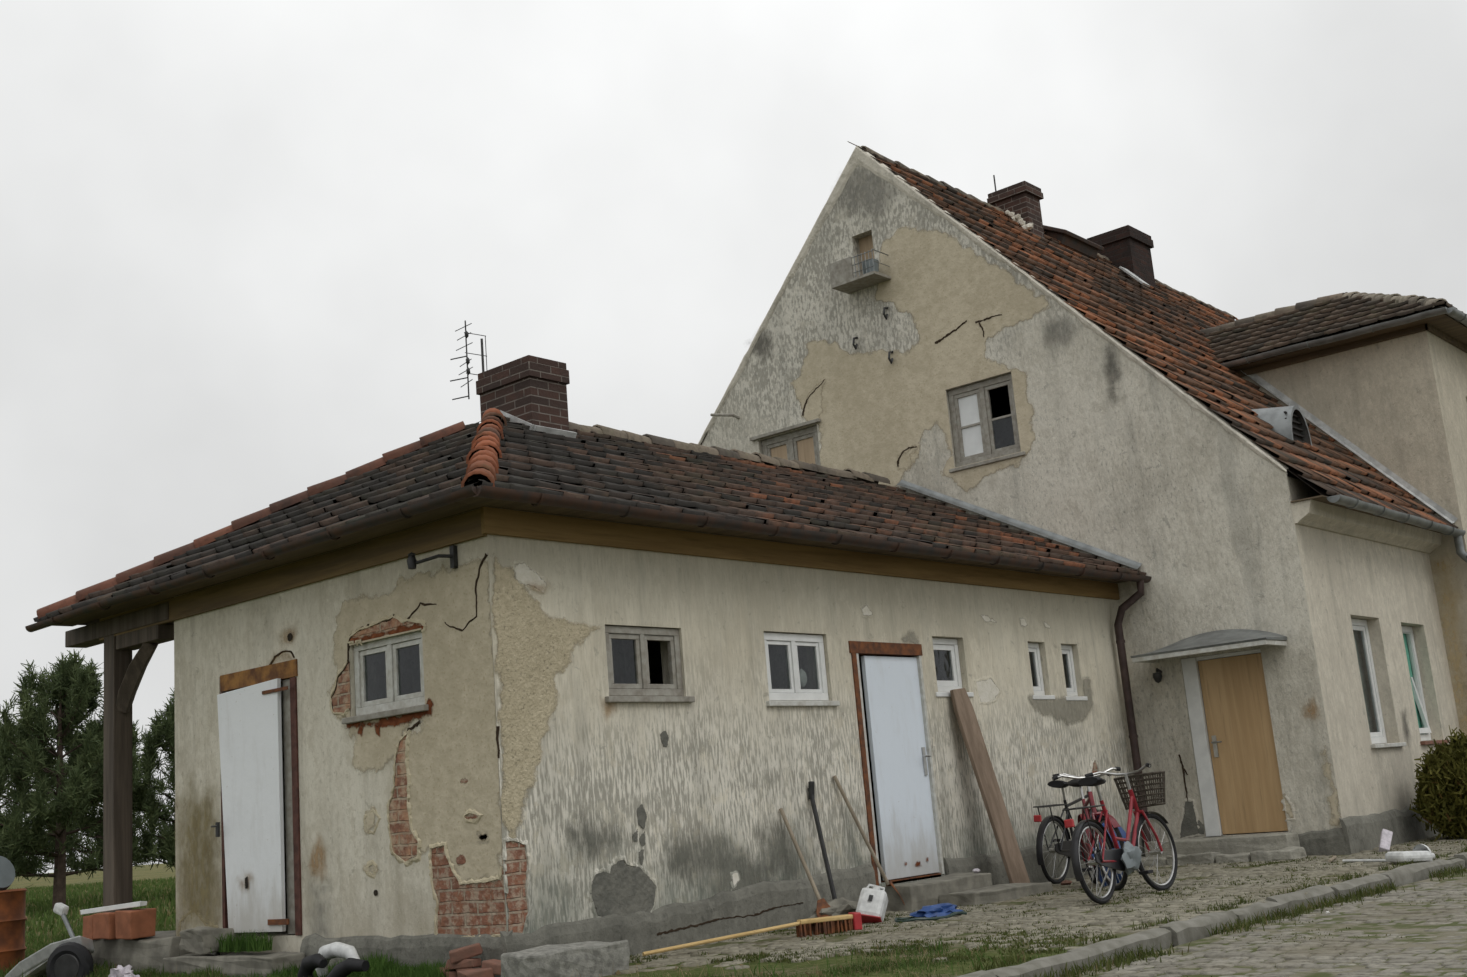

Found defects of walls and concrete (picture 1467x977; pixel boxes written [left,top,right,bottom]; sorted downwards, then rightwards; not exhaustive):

flaking render [790,226,1049,492]
crack [935,314,1002,344]
crack [331,553,488,710]
flaking render [329,557,597,937]
flaking render [587,804,657,918]